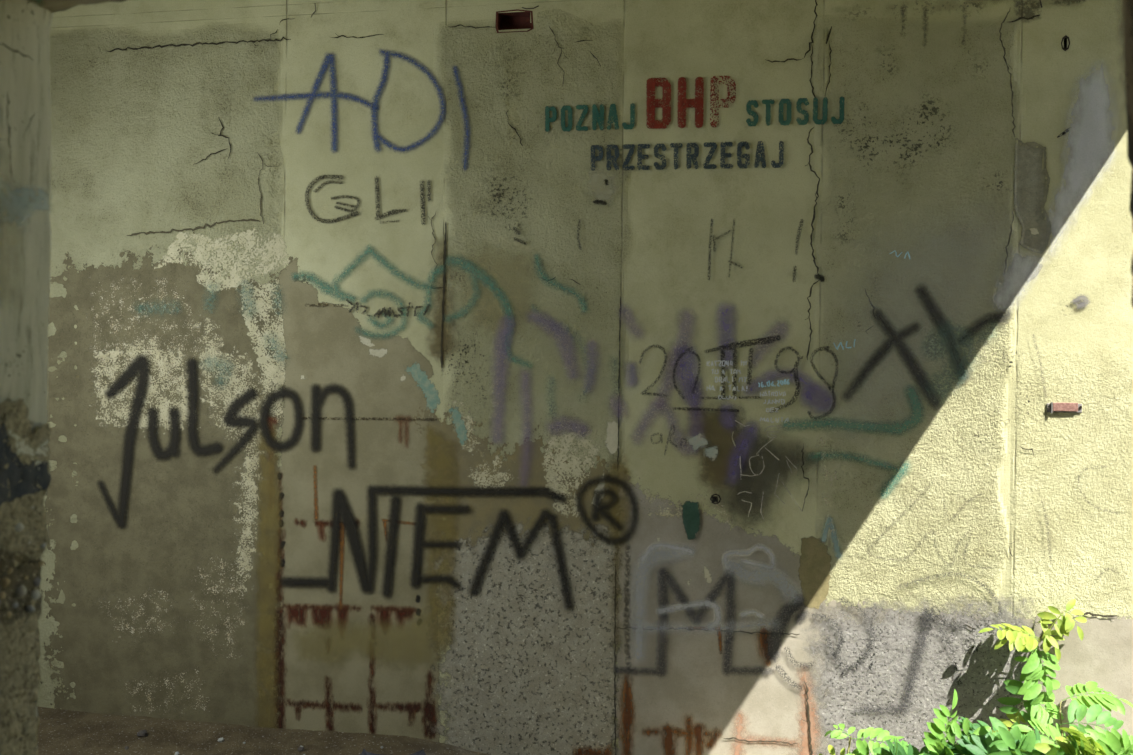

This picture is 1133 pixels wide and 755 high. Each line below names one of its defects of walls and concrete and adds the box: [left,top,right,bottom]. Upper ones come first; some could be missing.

crack [107,18,295,52]
crack [767,0,832,97]
crack [999,10,1040,137]
crack [127,119,281,236]
crack [805,127,820,360]
crack [1004,211,1014,280]
flaking render [1014,138,1051,281]
flaking render [0,228,1133,755]
corrosion [274,466,437,739]
corrosion [574,546,722,755]
corrosion [758,626,771,665]
corrosion [733,672,819,755]